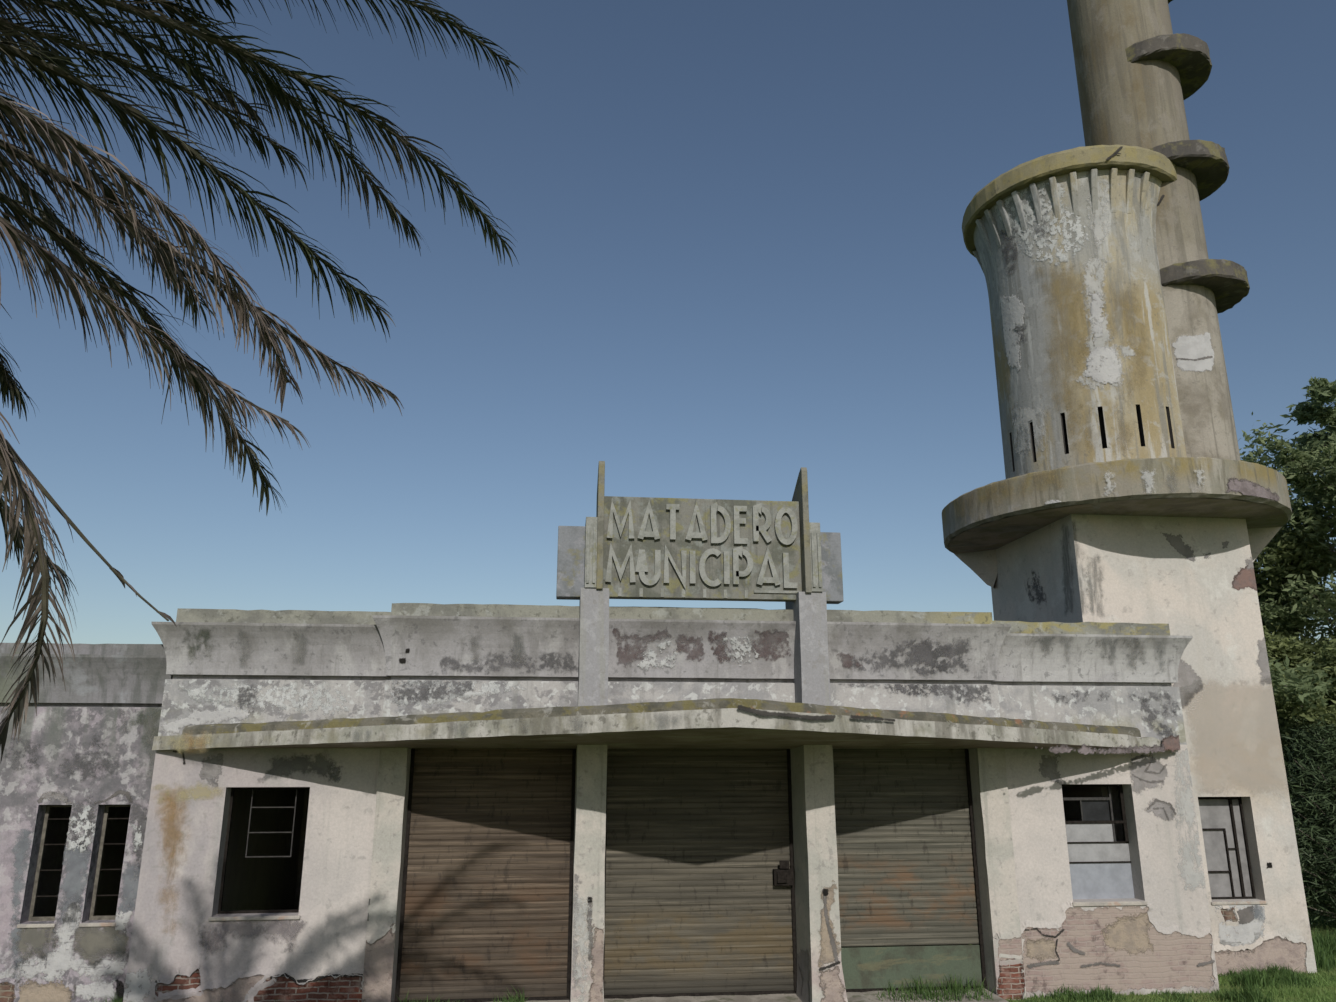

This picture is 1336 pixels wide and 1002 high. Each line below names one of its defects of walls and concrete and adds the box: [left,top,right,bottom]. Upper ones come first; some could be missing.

peeling [995,179,1135,389]
peeling [1011,407,1046,455]
peeling [1162,533,1228,562]
flaking render [1232,557,1257,591]
peeling [1035,735,1180,821]
peeling [67,801,96,853]
peeling [131,804,147,866]
flaking render [0,899,396,1002]
spalling [796,884,846,1002]
flaking render [993,901,1313,1000]